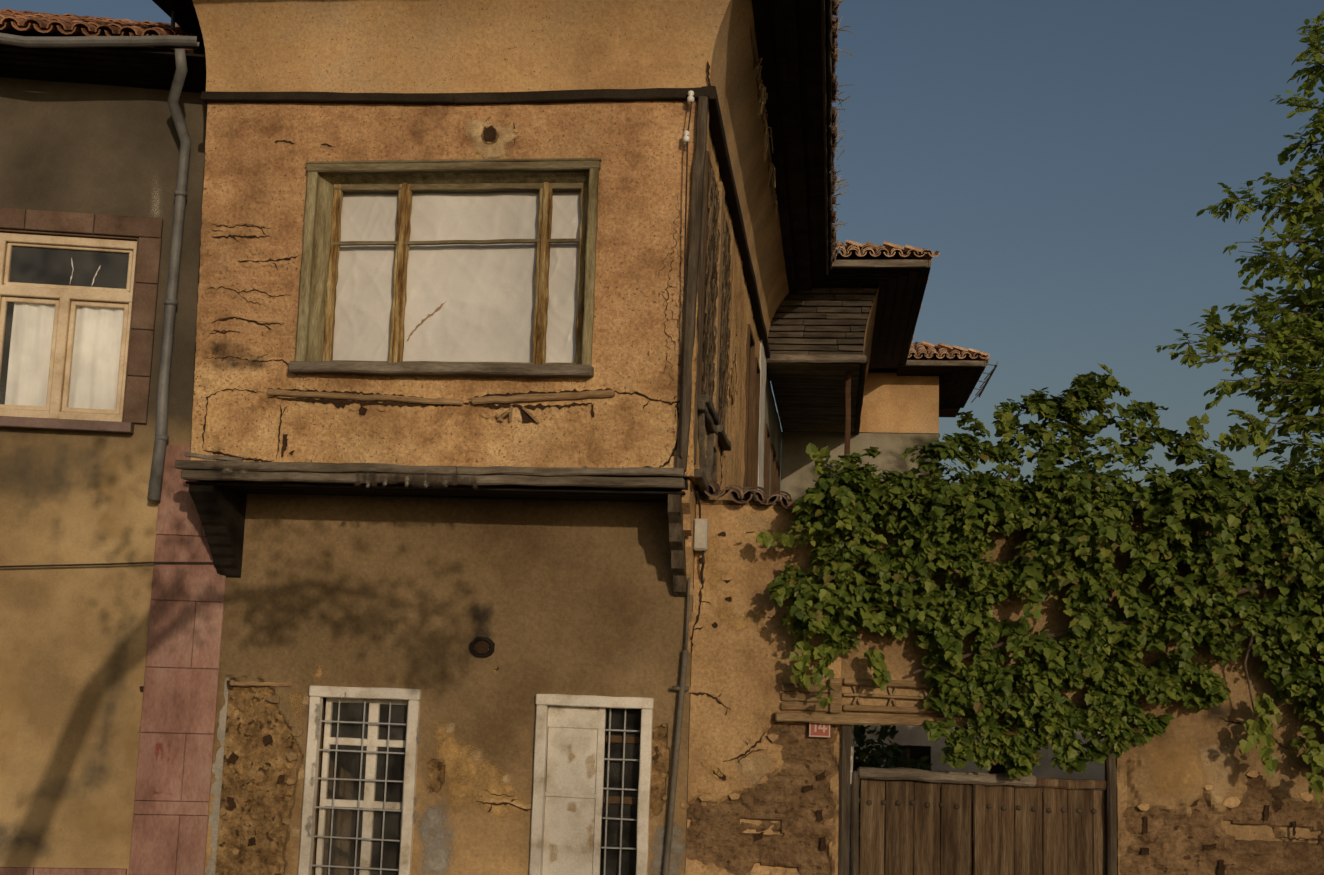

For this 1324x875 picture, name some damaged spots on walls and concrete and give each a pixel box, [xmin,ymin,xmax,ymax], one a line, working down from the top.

flaking render [469,120,519,159]
crack [202,218,301,462]
flaking render [281,434,295,457]
flaking render [267,388,615,423]
crack [720,291,743,490]
crack [683,576,710,653]
flaking render [214,677,320,875]
flaking render [649,721,837,875]
flaking render [1117,747,1324,875]